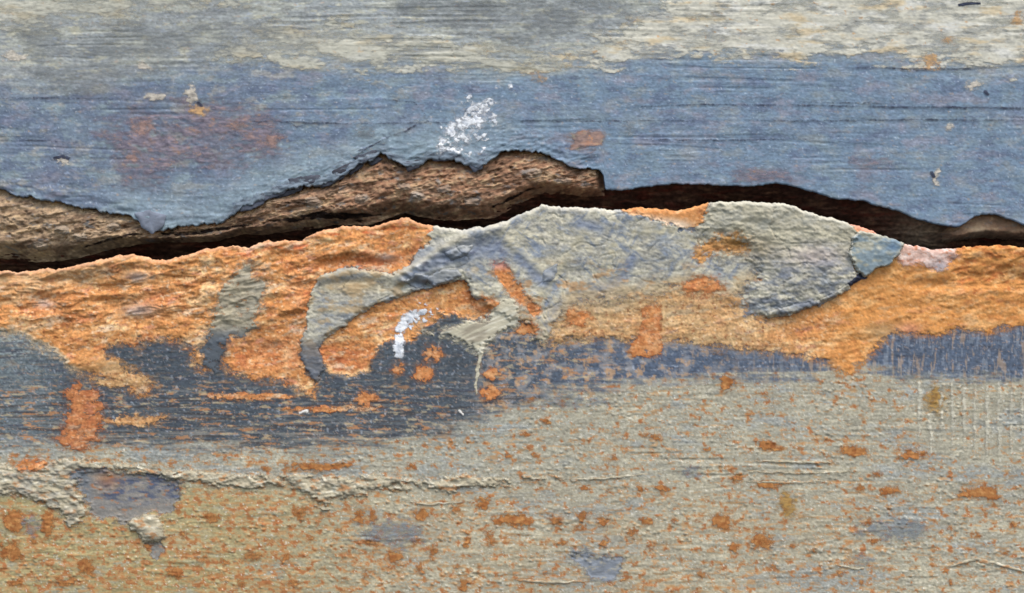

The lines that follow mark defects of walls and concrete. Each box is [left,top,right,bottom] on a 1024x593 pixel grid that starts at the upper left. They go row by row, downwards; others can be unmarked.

crack [0,183,1024,273]
rust [621,202,708,228]
peeling [0,147,762,394]
rust [319,231,1024,382]
rust [0,217,434,452]
rust [479,367,502,401]
rust [284,461,353,471]
rust [0,509,28,561]
spalling [70,467,182,525]
rust [478,496,534,545]
rust [729,473,797,516]
rust [955,485,1001,501]